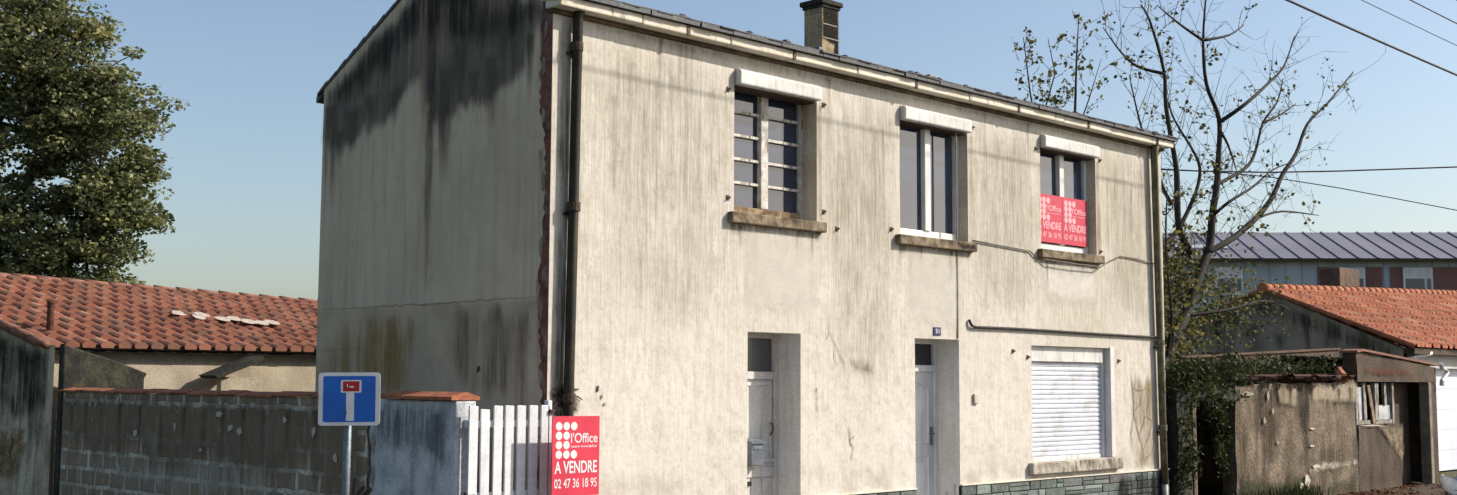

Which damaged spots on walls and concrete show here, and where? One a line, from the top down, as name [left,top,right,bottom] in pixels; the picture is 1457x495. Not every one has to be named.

leakage [326,0,544,147]
leakage [0,339,46,415]
leakage [62,397,357,495]